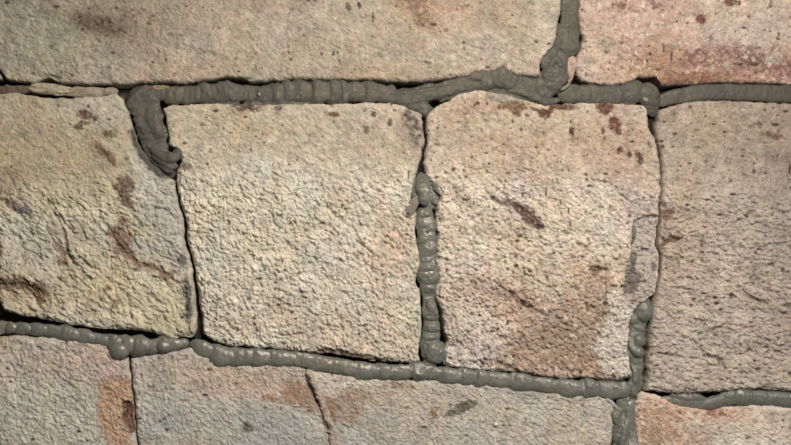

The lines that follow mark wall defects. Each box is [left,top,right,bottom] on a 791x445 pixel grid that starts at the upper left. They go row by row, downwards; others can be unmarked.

crack [128,356,139,445]
crack [306,369,340,445]